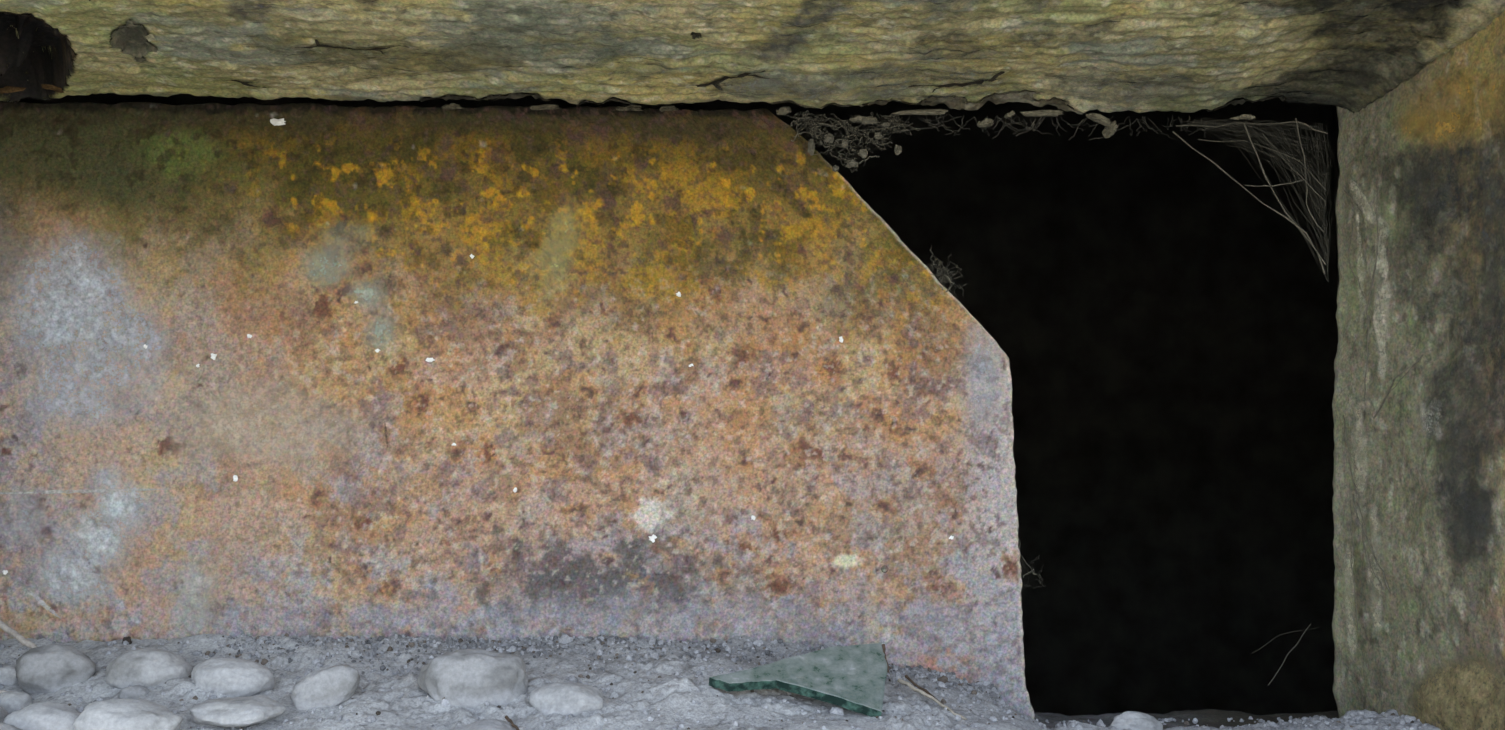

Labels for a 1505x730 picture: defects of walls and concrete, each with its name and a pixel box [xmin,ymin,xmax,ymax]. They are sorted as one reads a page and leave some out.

spalling [0,11,77,103]
damp [1240,0,1460,110]
damp [1397,134,1505,556]